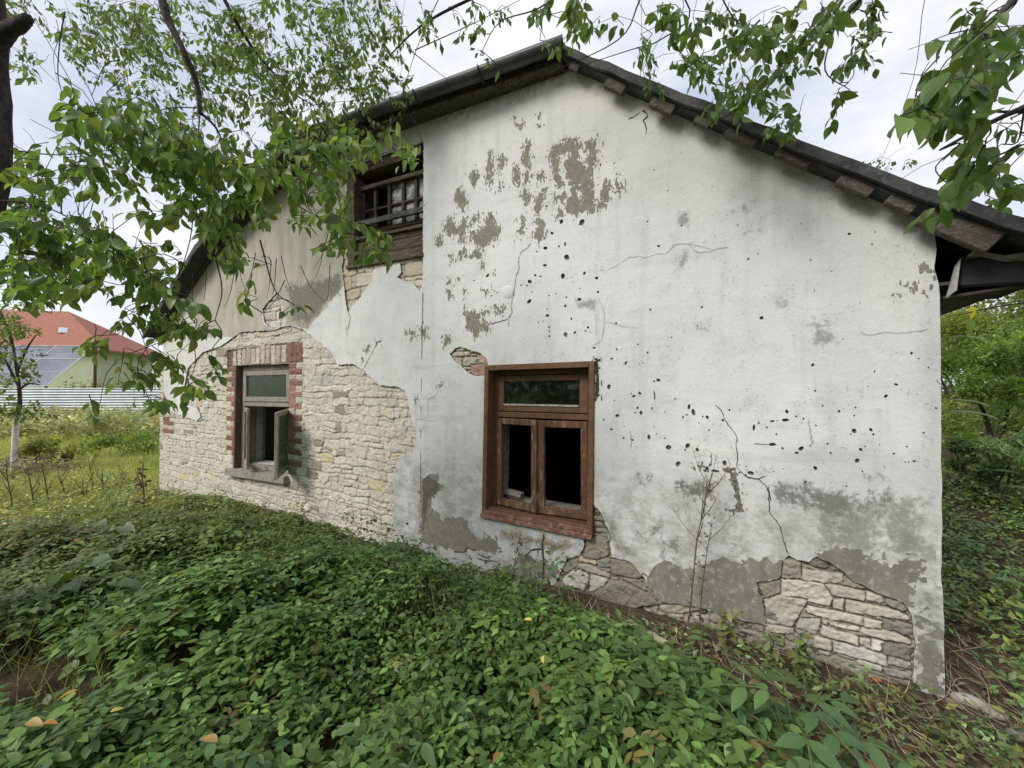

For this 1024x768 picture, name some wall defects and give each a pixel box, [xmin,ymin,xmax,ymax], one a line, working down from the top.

spalling [159,153,423,548]
crack [490,243,531,326]
peeling [404,111,628,376]
crack [610,243,725,269]
spalling [418,472,945,696]
damp [676,481,713,497]
crack [705,405,788,553]
damp [775,482,935,558]